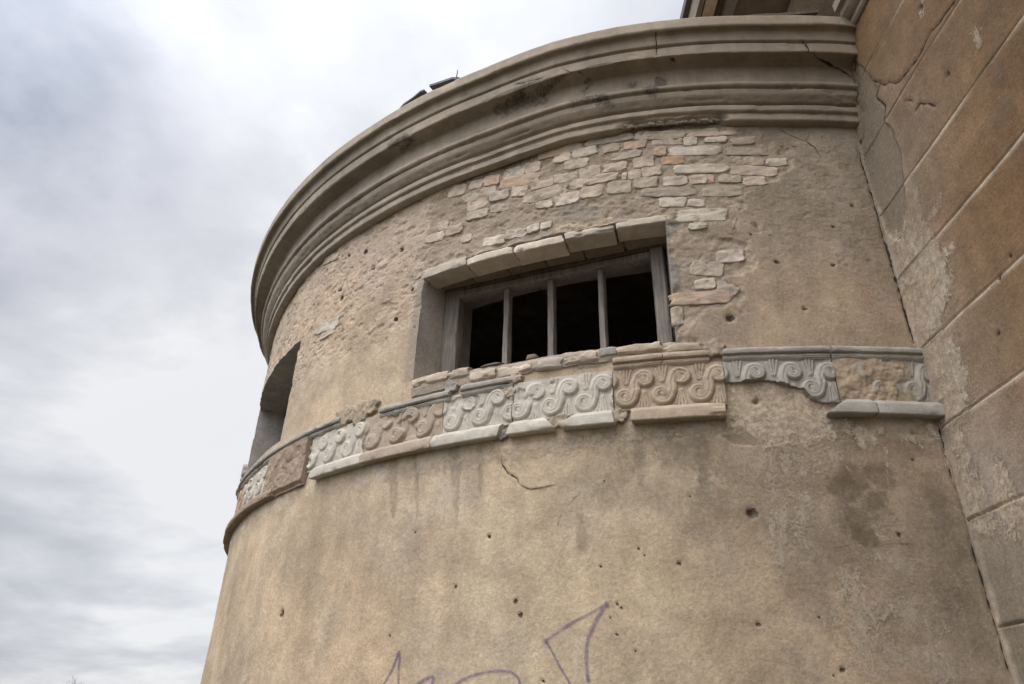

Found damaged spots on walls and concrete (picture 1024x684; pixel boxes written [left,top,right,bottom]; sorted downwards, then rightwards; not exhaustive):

crack [501,458,579,525]
flaking render [411,117,790,343]
crack [802,1,955,340]
damp [842,173,1024,541]